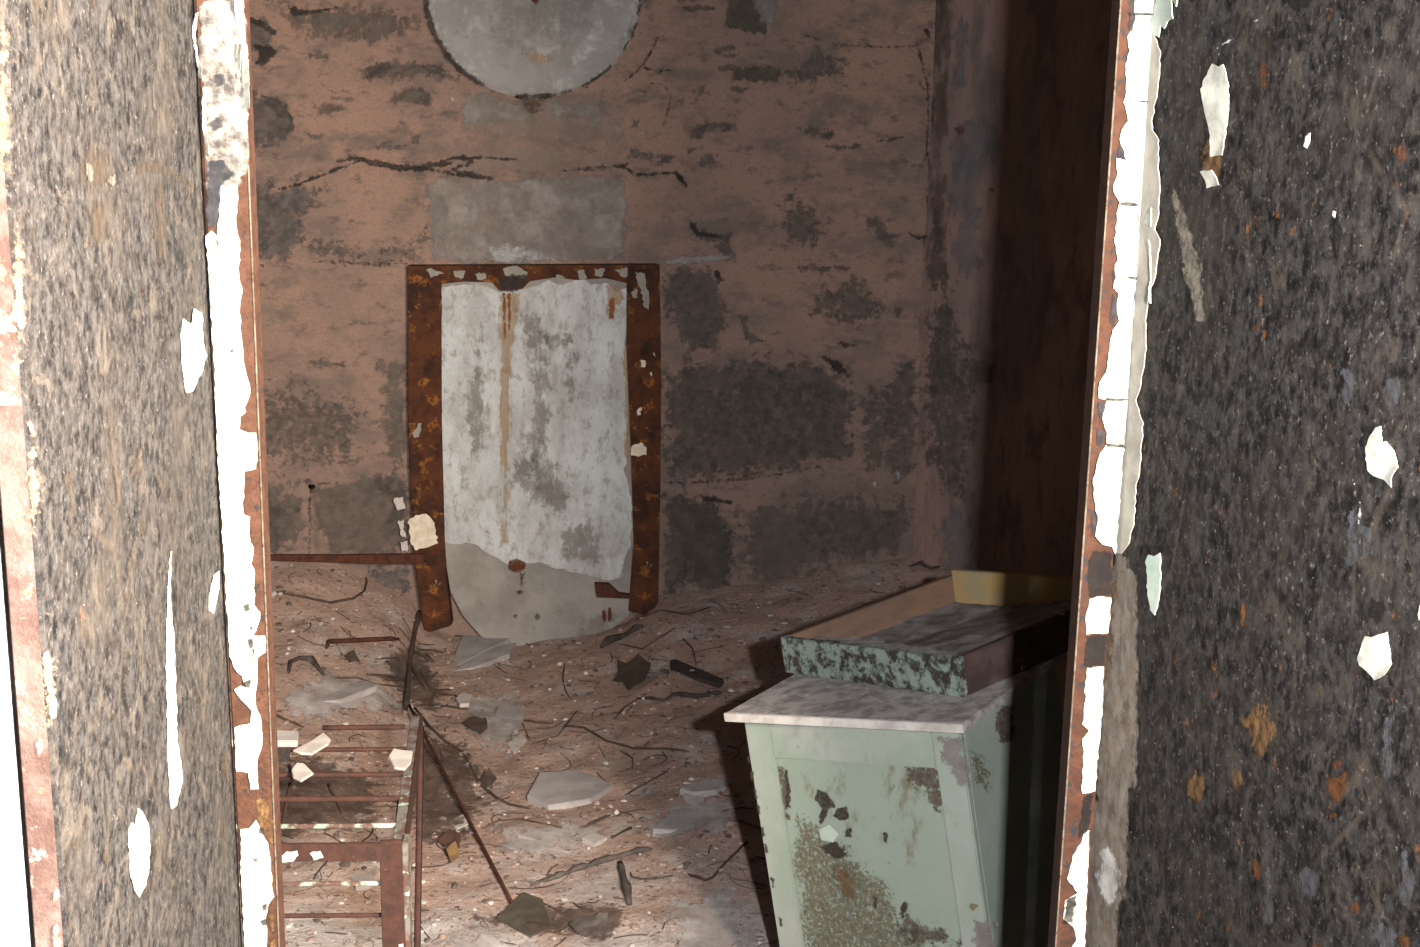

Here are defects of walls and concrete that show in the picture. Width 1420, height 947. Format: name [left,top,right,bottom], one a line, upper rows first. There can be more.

peeling [1200,64,1229,188]
crack [278,154,518,190]
crack [562,163,688,188]
rust [606,286,624,319]
peeling [181,0,763,789]
rust [498,274,526,505]
peeling [1063,0,1178,947]
peeling [1365,426,1398,487]
rust [508,559,525,595]
peeling [1357,632,1392,680]
rust [1241,700,1276,762]
rust [1187,770,1207,804]